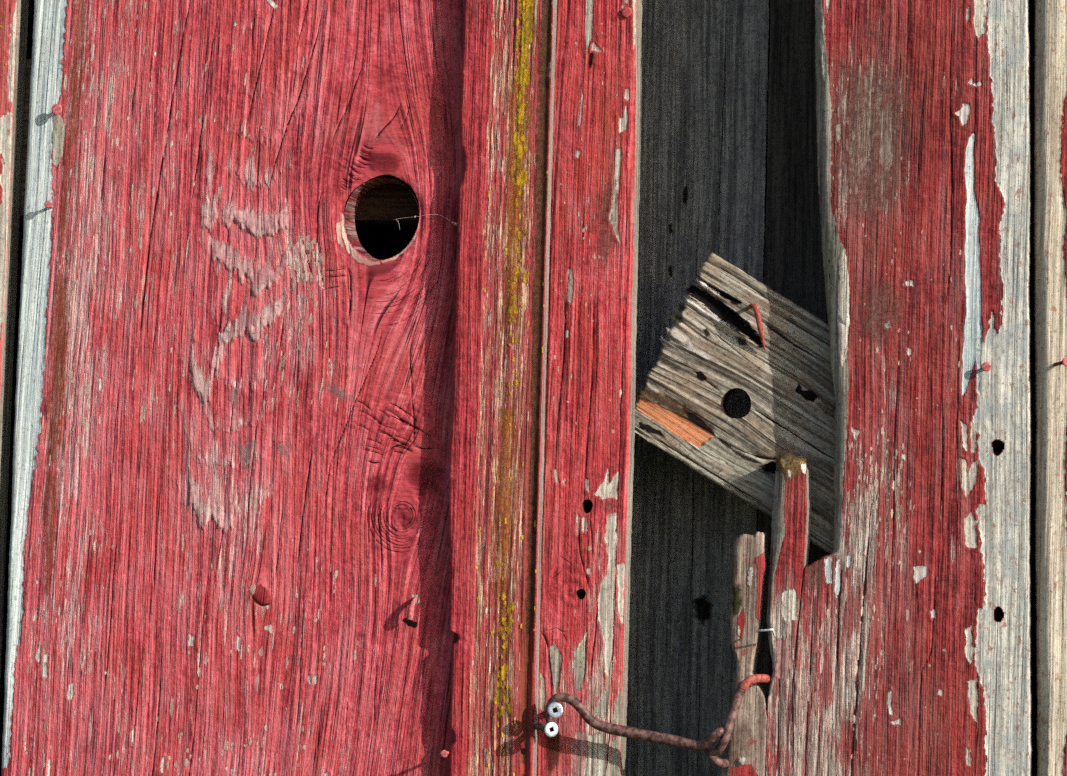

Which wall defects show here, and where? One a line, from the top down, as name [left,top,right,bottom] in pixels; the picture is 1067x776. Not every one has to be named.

peeling [564,0,604,54]
peeling [620,0,637,49]
peeling [578,88,629,260]
peeling [0,0,187,776]
spalling [760,0,915,769]
peeling [950,0,1067,776]
peeling [586,469,618,500]
peeling [576,515,588,535]
peeling [913,550,938,584]
peeling [593,513,625,723]
peeling [540,633,587,711]
peeling [572,731,621,776]